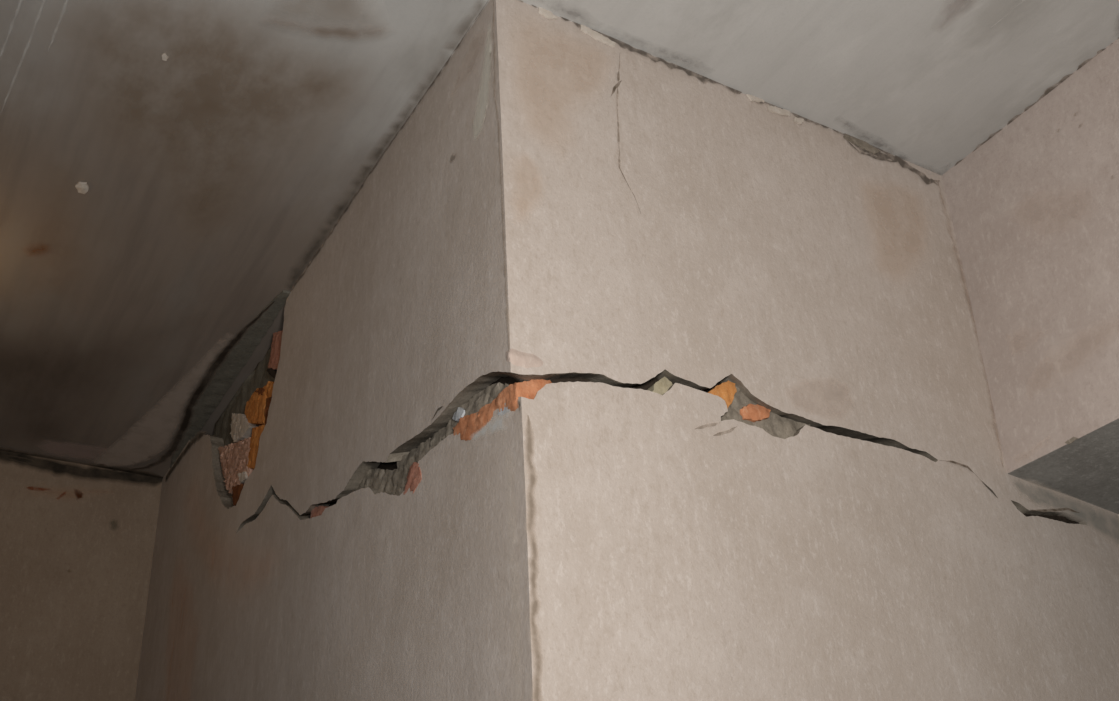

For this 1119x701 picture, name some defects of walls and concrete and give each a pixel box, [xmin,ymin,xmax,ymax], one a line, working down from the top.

damp [103,38,331,223]
crack [520,0,1119,213]
damp [0,335,230,465]
flaking render [213,329,283,506]
crack [0,1,595,701]
crack [628,376,672,395]
crack [695,380,875,443]
crack [942,406,1119,544]